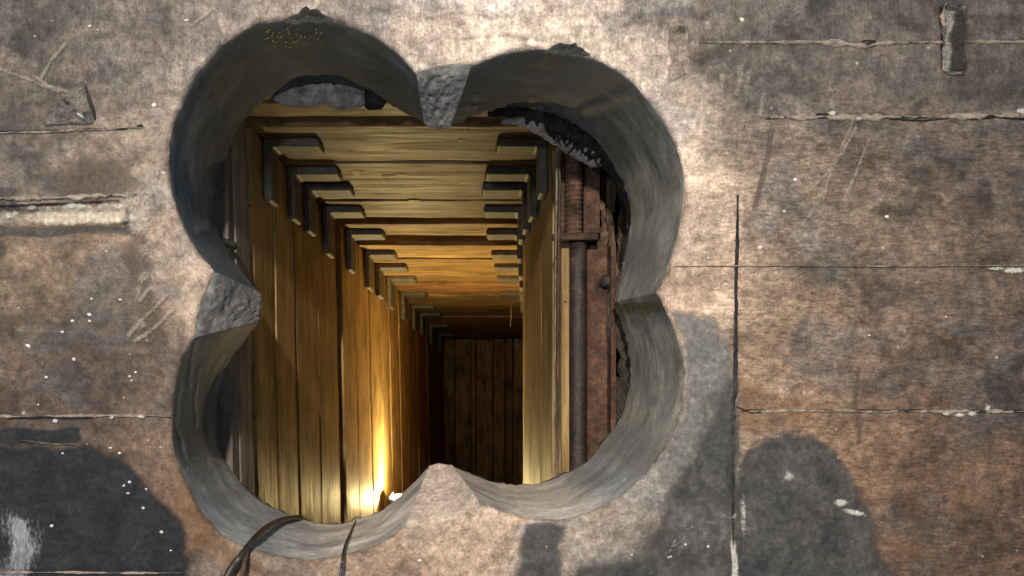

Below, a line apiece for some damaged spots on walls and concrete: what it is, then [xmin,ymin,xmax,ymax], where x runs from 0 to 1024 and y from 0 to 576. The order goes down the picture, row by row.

spalling [940,3,968,75]
spalling [44,80,96,127]
crack [0,124,143,132]
spalling [416,64,479,130]
crack [890,115,1024,123]
spalling [194,271,262,338]
crack [731,195,766,547]
crack [7,414,93,422]
crack [805,406,923,414]